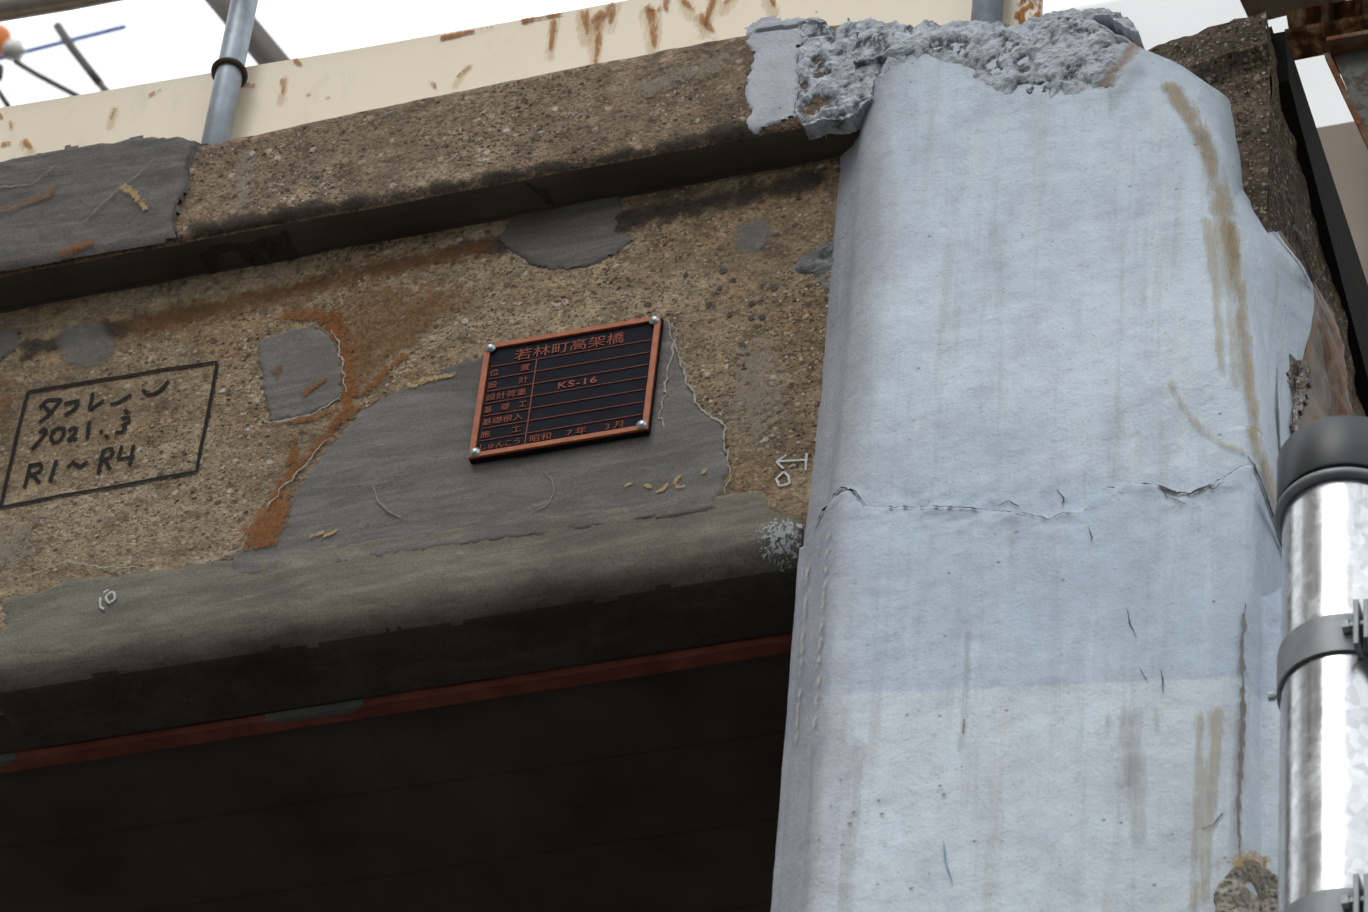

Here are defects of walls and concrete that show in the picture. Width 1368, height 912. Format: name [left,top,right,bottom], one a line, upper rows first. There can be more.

corrosion [440,27,492,40]
corrosion [521,13,562,50]
corrosion [580,2,615,63]
corrosion [645,0,727,46]
spalling [853,8,1145,98]
corrosion [237,307,408,551]
crack [812,486,1093,542]
crack [1103,457,1274,519]
spalling [1213,850,1278,912]